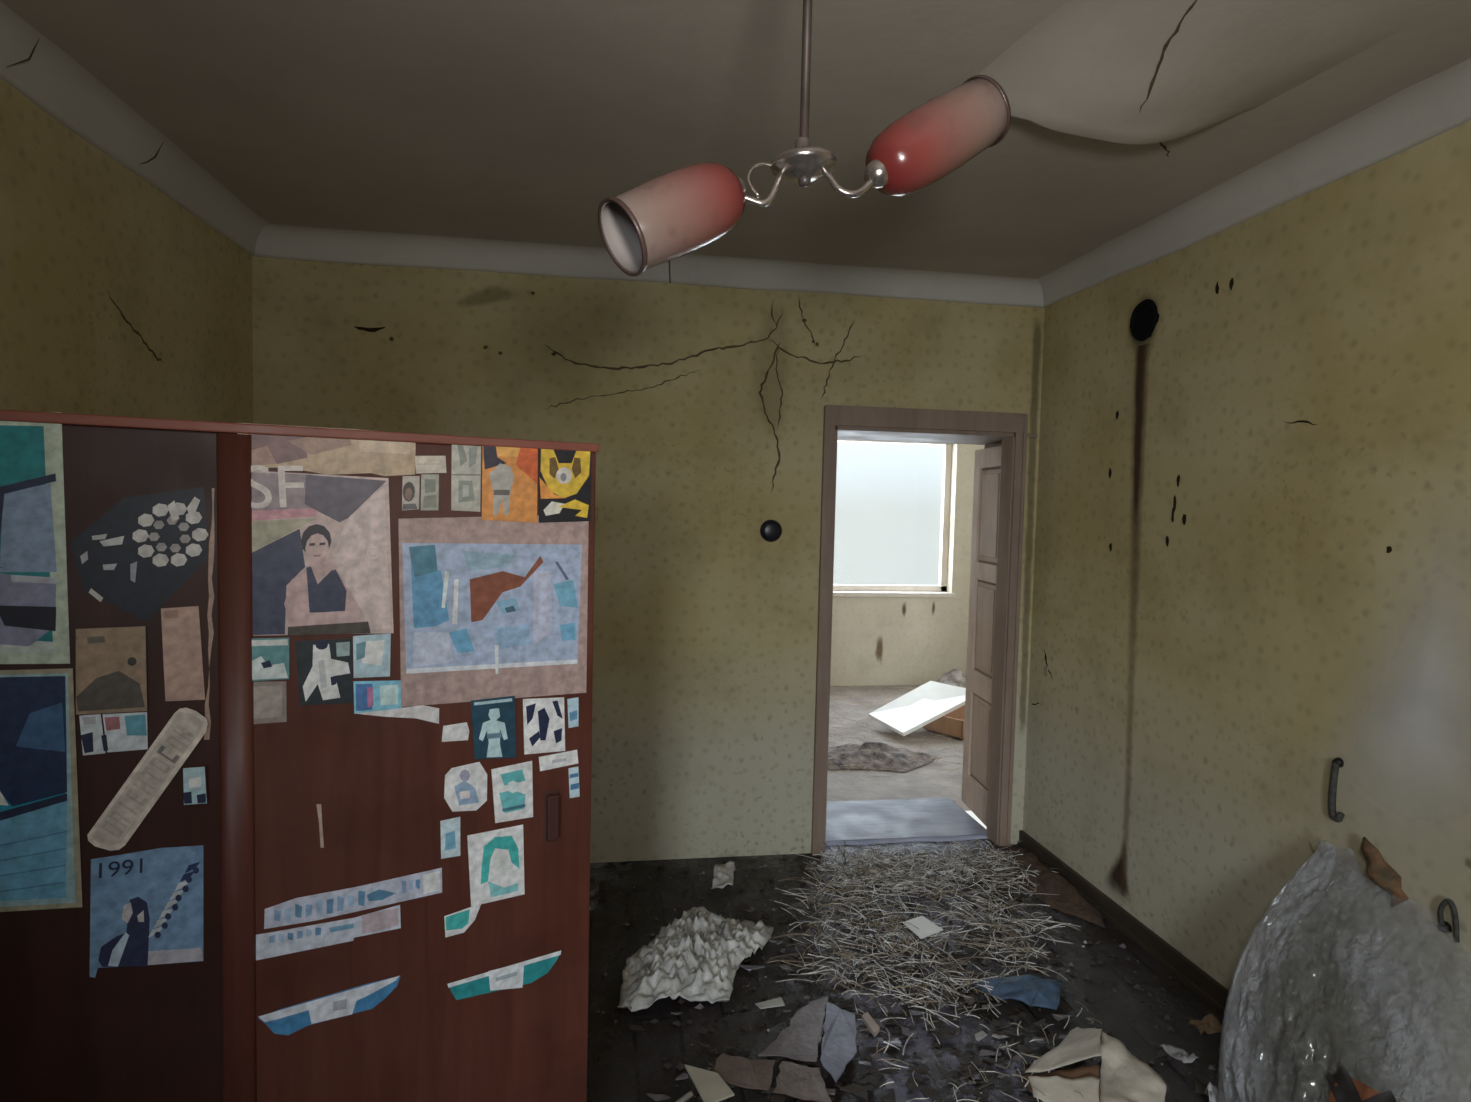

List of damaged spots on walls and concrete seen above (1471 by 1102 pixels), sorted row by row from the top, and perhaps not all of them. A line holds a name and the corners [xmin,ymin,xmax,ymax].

crack [1140,0,1197,111]
crack [545,298,861,492]